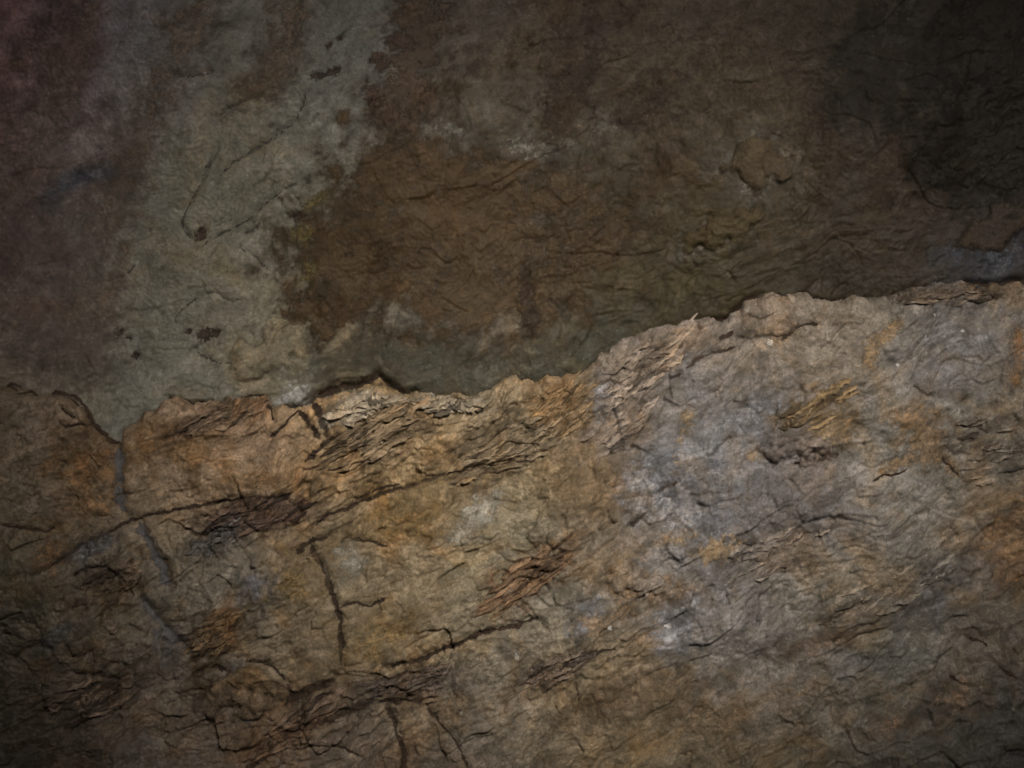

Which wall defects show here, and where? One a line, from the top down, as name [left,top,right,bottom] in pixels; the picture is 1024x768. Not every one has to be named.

spalling [892,283,1003,307]
peeling [182,327,221,342]
spalling [160,396,271,443]
spalling [316,382,492,479]
spalling [445,313,700,489]
spalling [778,378,860,432]
crack [4,374,494,768]